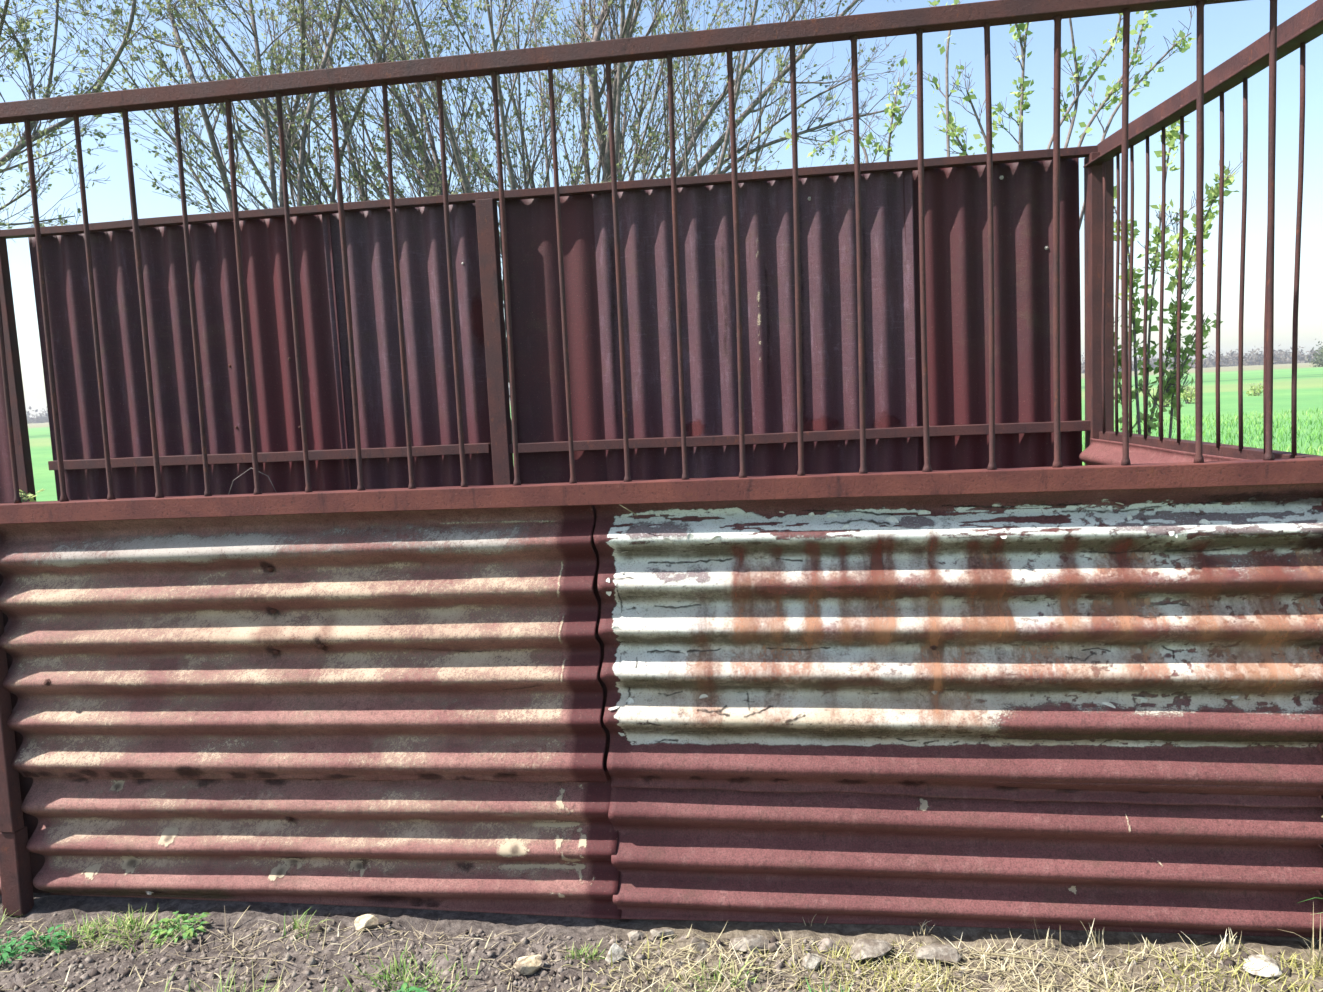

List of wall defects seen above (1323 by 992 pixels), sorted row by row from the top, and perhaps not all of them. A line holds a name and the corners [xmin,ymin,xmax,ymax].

peeling [606,499,1323,748]
corrosion [691,536,1323,732]